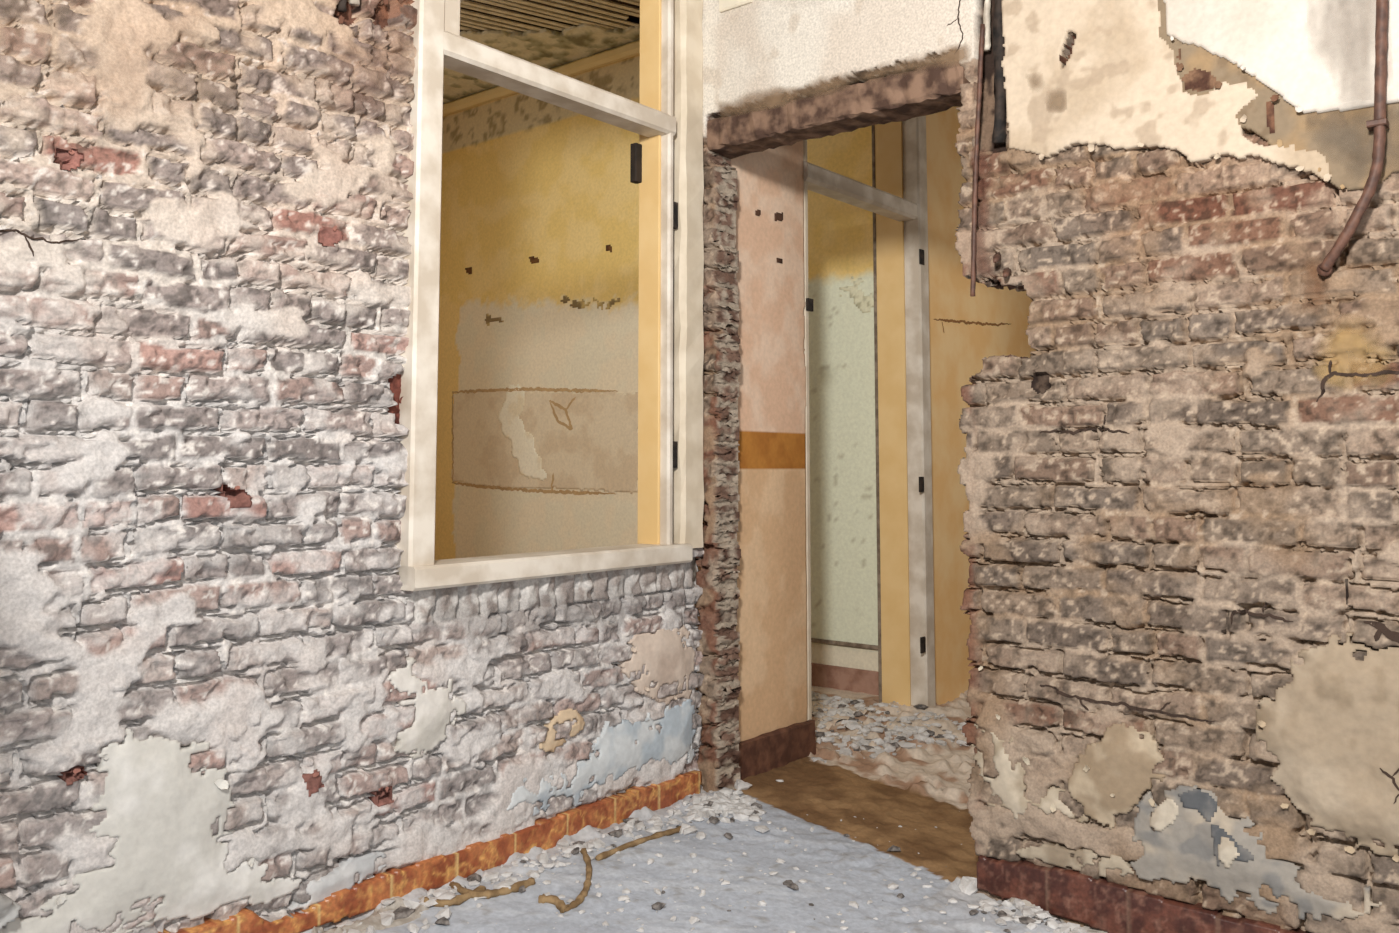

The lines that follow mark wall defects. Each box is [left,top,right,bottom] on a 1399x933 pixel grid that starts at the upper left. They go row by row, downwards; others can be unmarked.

flaking render [443,67,498,104]
flaking render [460,24,640,69]
flaking render [1001,0,1399,191]
spalling [53,148,84,171]
spalling [387,374,403,425]
peeling [451,384,638,494]
spalling [213,484,252,508]
flaking render [388,657,466,759]
peeling [507,625,696,816]
flaking render [0,727,387,933]
spalling [368,786,394,807]
peeling [971,714,1382,921]